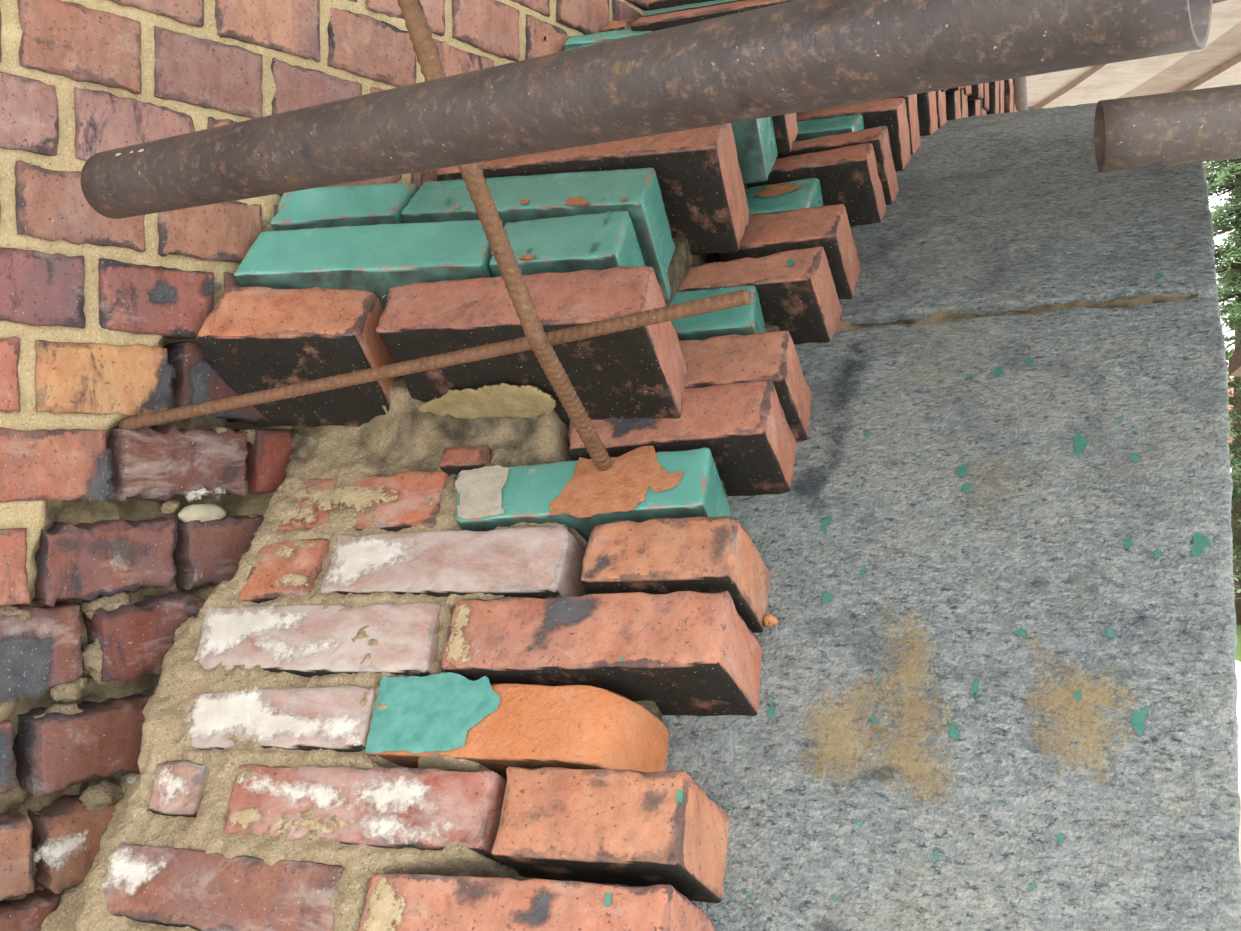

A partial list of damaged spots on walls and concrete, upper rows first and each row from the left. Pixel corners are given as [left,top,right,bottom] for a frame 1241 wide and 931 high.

leakage [326,538,413,586]
leakage [194,607,339,663]
leakage [189,689,360,745]
leakage [159,768,184,802]
leakage [240,777,450,841]
leakage [103,849,165,894]